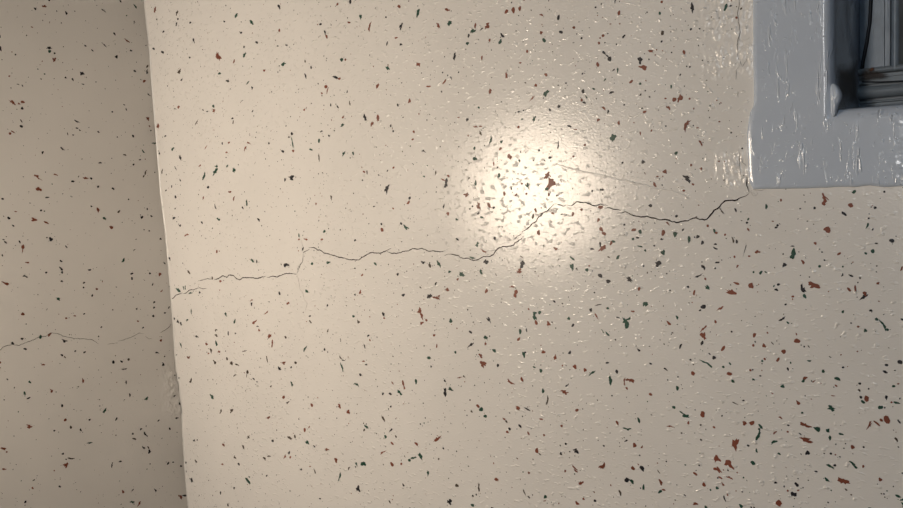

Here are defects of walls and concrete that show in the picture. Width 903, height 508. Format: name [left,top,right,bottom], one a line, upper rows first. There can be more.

crack [172,157,749,299]